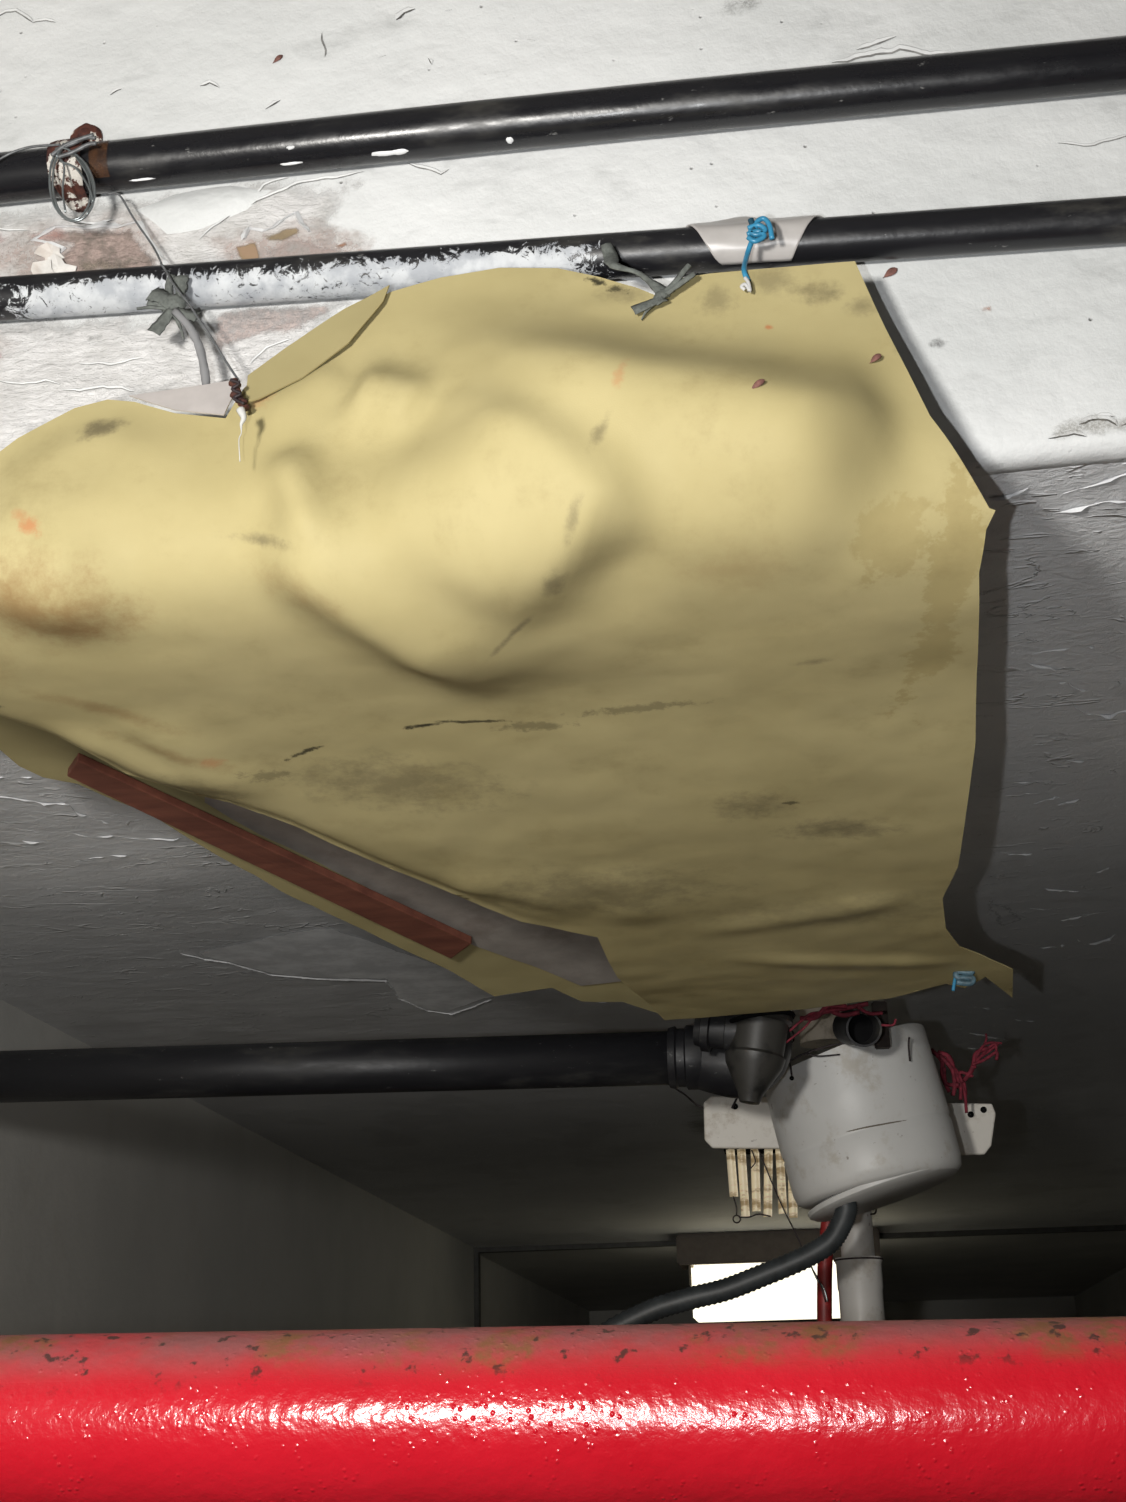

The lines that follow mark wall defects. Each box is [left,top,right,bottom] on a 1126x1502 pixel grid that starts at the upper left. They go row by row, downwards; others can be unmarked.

peeling [0,184,351,277]
peeling [181,929,524,1015]